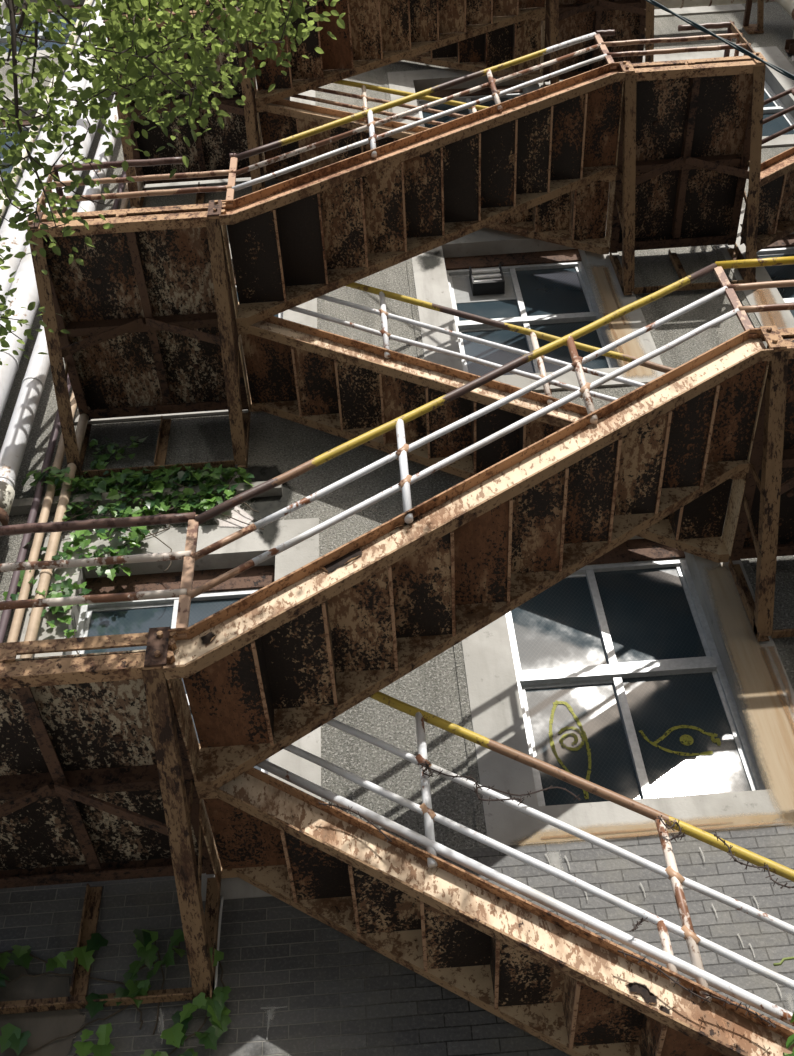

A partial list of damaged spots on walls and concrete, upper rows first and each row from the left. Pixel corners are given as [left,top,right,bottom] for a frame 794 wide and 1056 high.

corrosion [517,566,794,844]